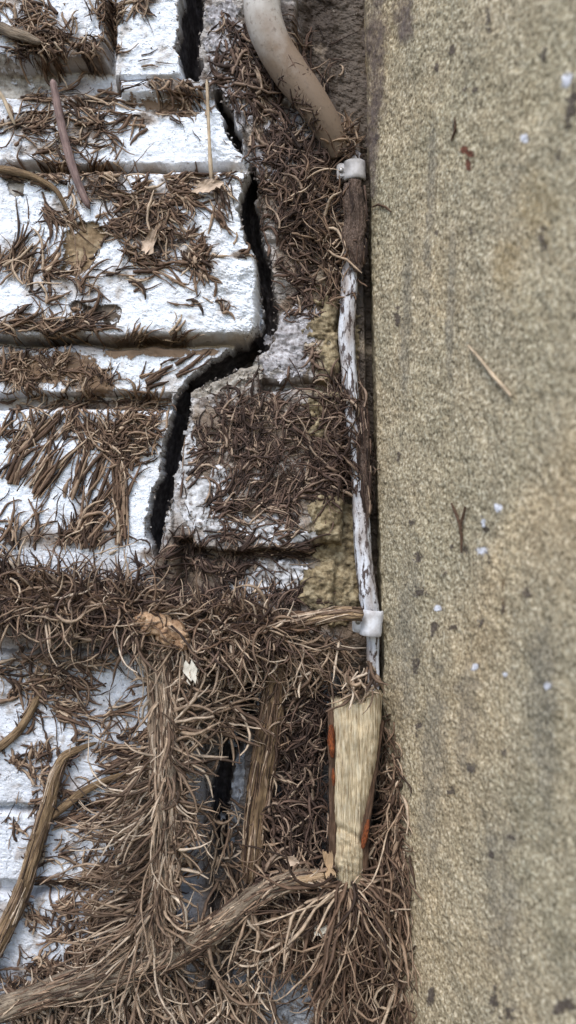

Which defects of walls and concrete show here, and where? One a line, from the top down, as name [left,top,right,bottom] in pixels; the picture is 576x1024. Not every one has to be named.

crack [142,0,278,553]
crack [210,668,260,862]